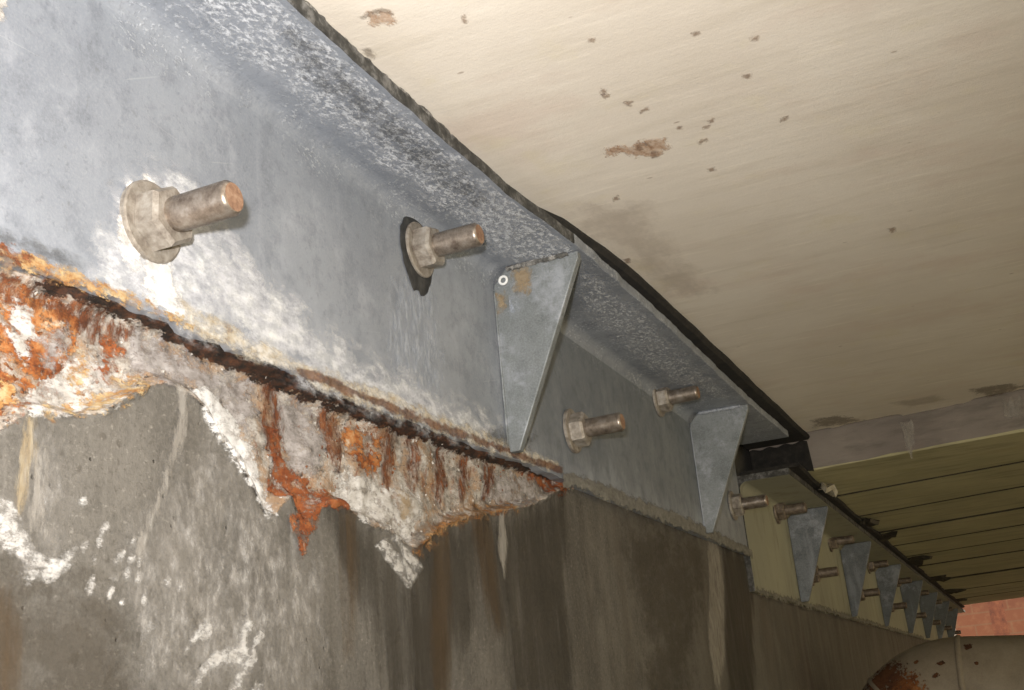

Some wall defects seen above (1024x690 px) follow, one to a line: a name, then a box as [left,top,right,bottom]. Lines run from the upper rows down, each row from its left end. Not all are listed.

spalling [367,11,395,27]
corrosion [0,242,195,332]
damp [0,418,72,582]
spalling [0,268,574,588]
corrosion [262,381,350,556]
corrosion [297,369,563,473]
damp [166,510,315,649]